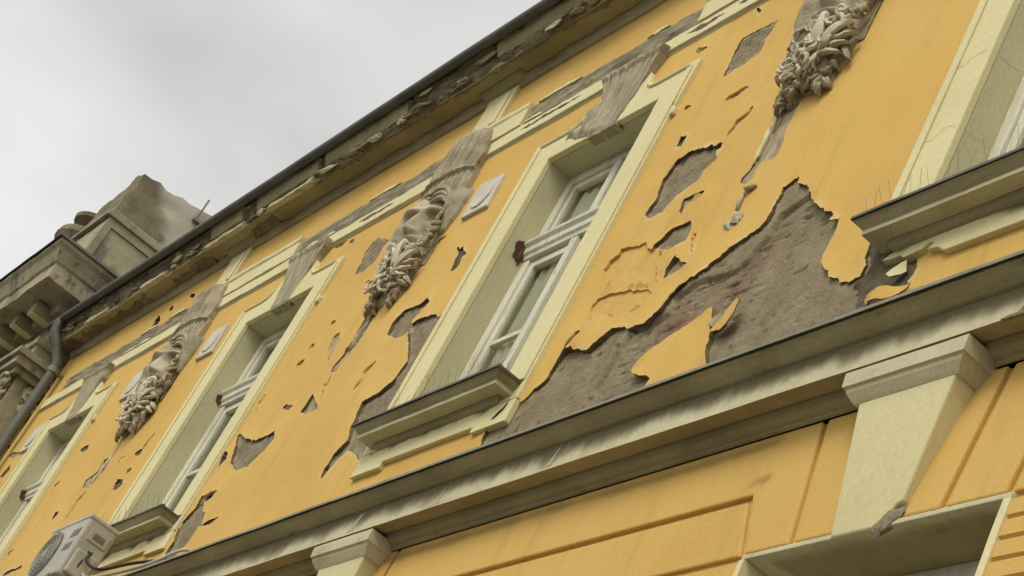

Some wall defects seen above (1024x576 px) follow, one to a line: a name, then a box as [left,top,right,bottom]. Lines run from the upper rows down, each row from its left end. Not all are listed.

spalling [317,0,613,186]
spalling [521,7,725,130]
flaking render [726,20,778,75]
spalling [299,158,444,253]
peeling [648,135,719,253]
flaking render [356,238,389,284]
spalling [60,293,194,392]
peeling [327,298,439,470]
peeling [484,181,917,444]
peeling [221,434,275,470]
peeling [168,491,215,558]
spalling [871,503,910,539]